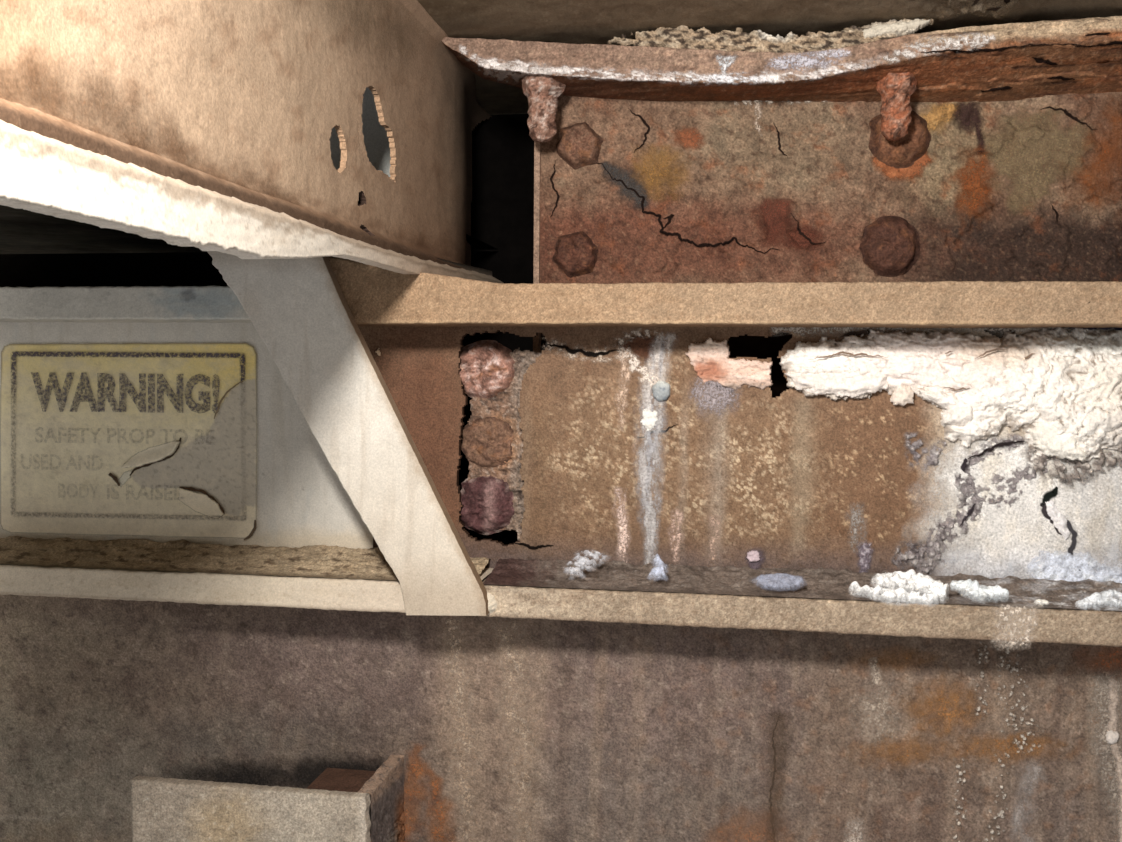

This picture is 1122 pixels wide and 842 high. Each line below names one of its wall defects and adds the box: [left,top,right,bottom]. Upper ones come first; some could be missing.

spalling [917,0,1017,22]
rust [608,18,934,53]
rust [921,104,957,131]
crack [597,108,825,254]
rust [873,154,931,180]
peeling [618,330,675,361]
spalling [685,337,773,414]
efflorescence [617,336,683,577]
crack [961,441,1025,472]
water stain [565,489,629,576]
crack [1040,486,1081,571]
water stain [746,549,804,589]